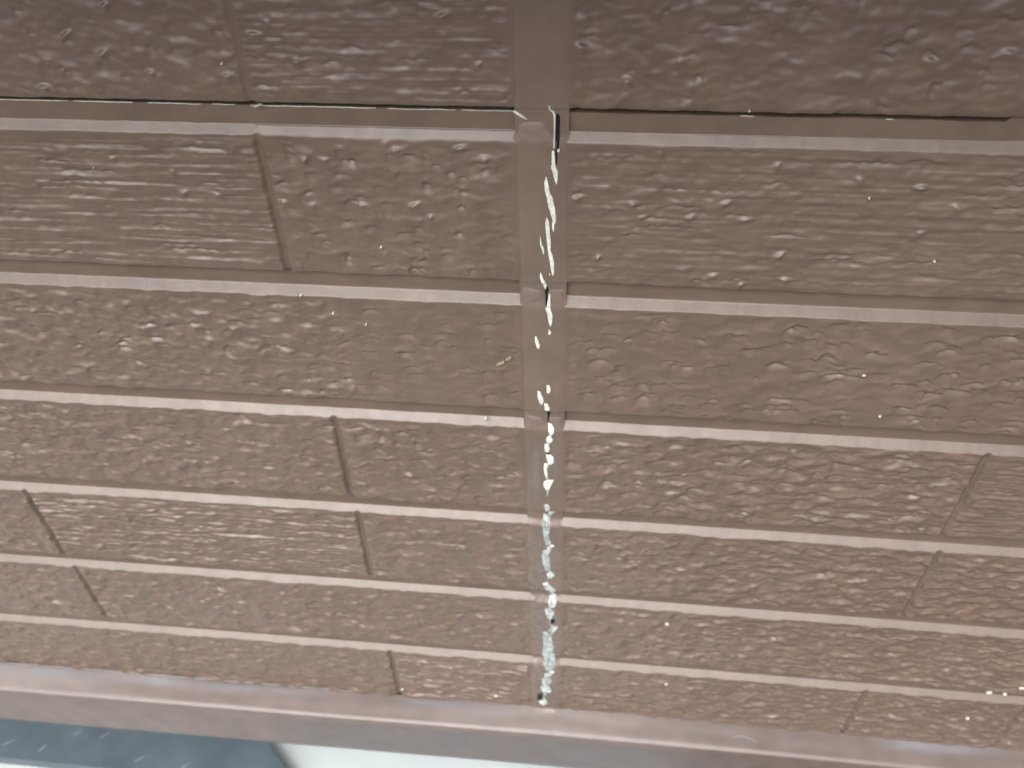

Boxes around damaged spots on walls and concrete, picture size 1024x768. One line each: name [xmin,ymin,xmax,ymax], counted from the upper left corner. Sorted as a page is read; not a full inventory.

crack [0,99,513,111]
crack [535,105,582,349]
crack [537,385,558,706]